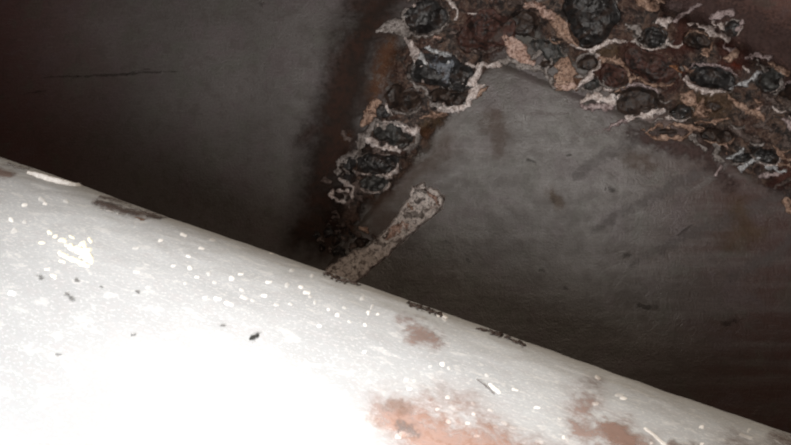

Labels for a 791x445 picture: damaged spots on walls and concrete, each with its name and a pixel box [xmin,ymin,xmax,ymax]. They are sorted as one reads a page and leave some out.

rust [290,0,791,257]
rust [375,401,518,445]
rust [569,420,648,445]